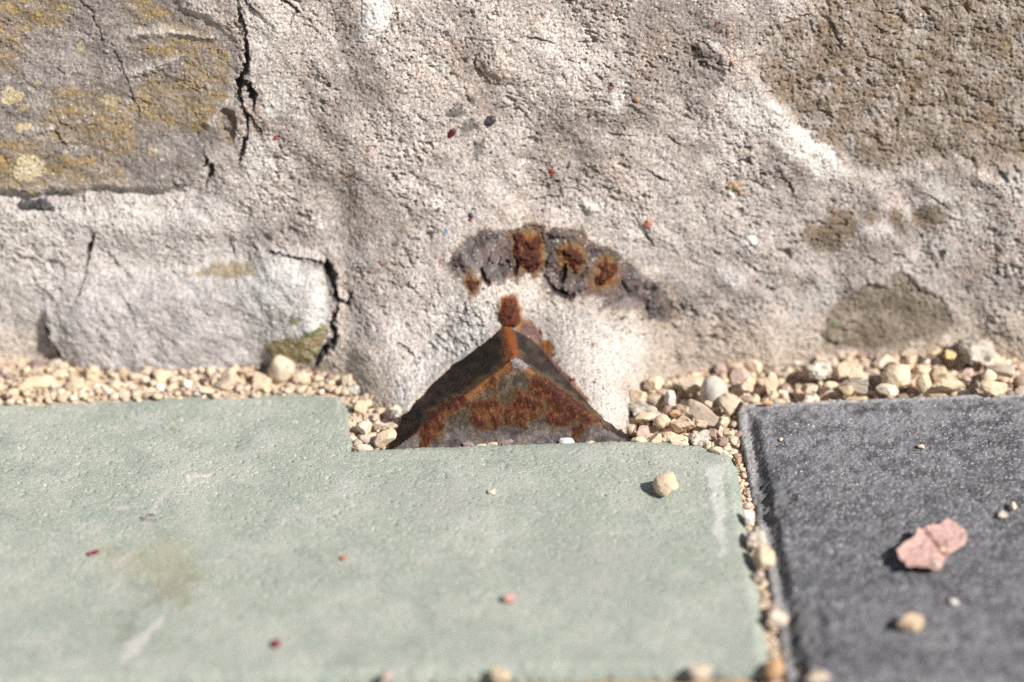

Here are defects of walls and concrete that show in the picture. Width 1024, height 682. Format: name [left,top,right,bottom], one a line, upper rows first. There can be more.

crack [203,9,263,187]
crack [269,250,353,366]
corrosion [448,222,674,326]
corrosion [419,320,602,447]